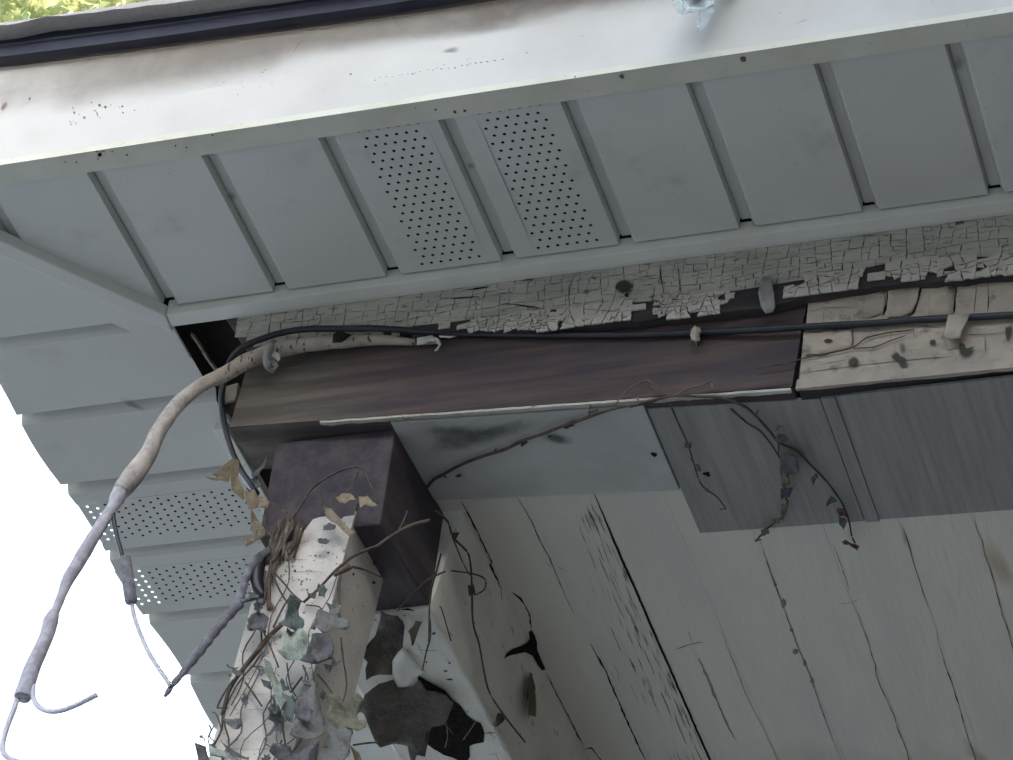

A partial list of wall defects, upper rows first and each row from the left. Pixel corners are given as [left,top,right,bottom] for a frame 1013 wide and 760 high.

peeling [332,332,351,343]
peeling [417,289,735,351]
peeling [802,328,853,356]
peeling [783,253,1013,318]
crack [974,517,1013,649]
crack [590,643,645,758]
crack [678,632,778,760]
crack [759,538,841,759]
crack [833,546,909,760]